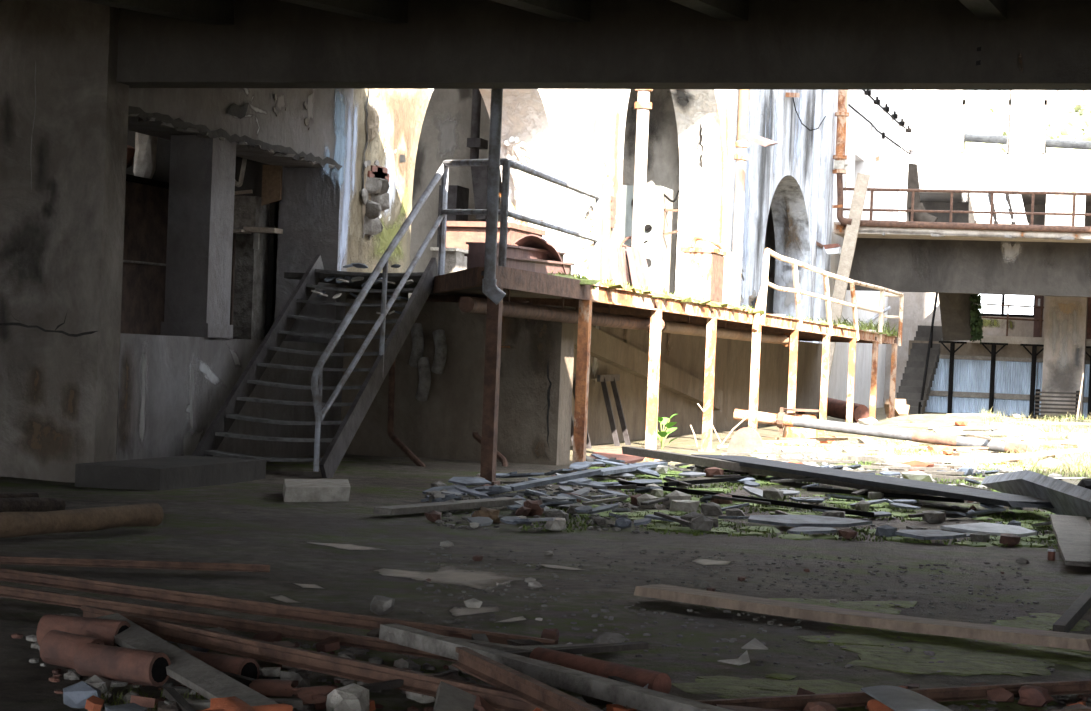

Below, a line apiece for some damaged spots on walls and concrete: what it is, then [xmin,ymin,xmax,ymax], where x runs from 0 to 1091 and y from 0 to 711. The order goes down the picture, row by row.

peeling [504,136,532,170]
crack [697,123,710,184]
spalling [601,161,617,255]
damp [743,90,819,307]
rust [590,449,645,465]